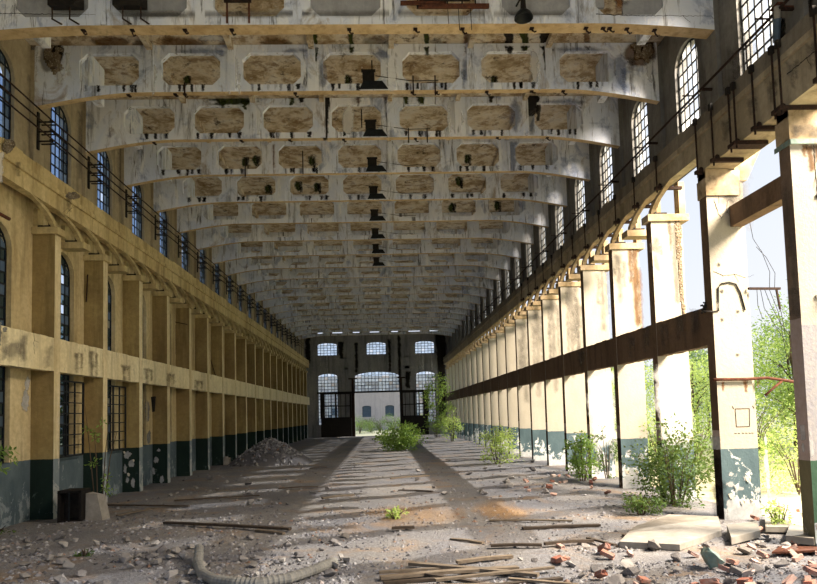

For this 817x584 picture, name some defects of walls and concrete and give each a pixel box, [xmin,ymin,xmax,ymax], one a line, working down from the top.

spalling [31,45,69,83]
spalling [625,42,656,82]
peeling [711,436,721,450]
peeling [123,451,135,488]
peeling [726,435,784,532]
spalling [689,540,817,584]